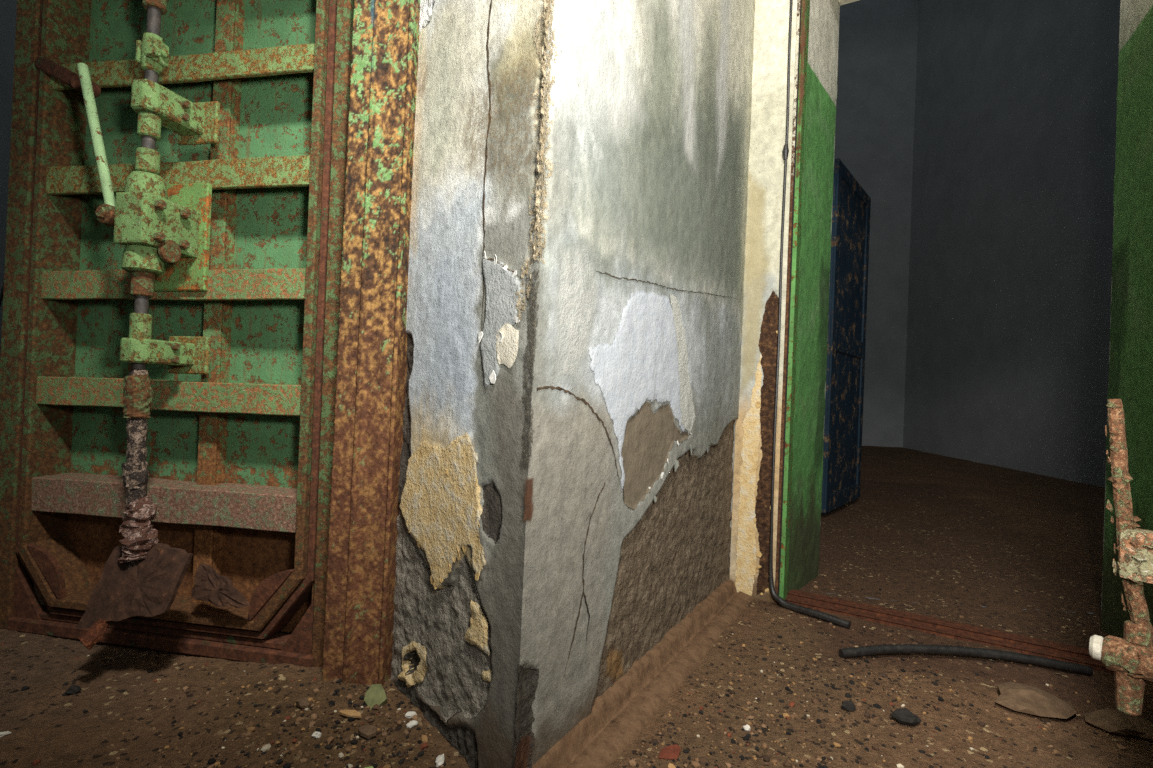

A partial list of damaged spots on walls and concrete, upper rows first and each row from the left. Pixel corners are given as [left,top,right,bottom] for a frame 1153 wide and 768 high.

crack [482,0,521,314]
spalling [478,0,558,469]
leakage [583,49,634,124]
leakage [680,0,694,158]
leakage [717,0,729,158]
spalling [390,333,502,768]
spalling [556,243,735,700]